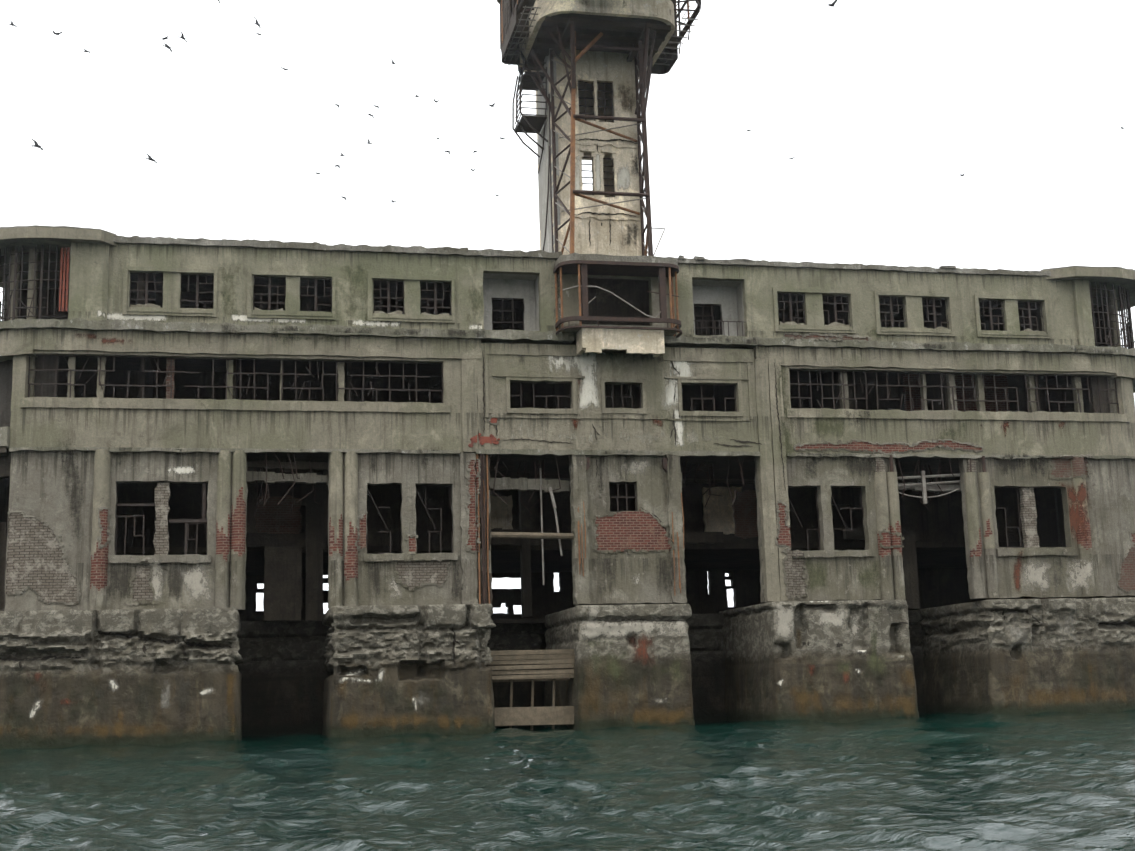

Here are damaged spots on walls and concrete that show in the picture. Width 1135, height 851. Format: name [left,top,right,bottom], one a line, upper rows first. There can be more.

corrosion [618,86,633,111]
water stain [548,352,598,407]
water stain [624,354,698,471]
spalling [793,439,983,511]
spalling [5,510,82,606]
flaking render [593,508,674,554]